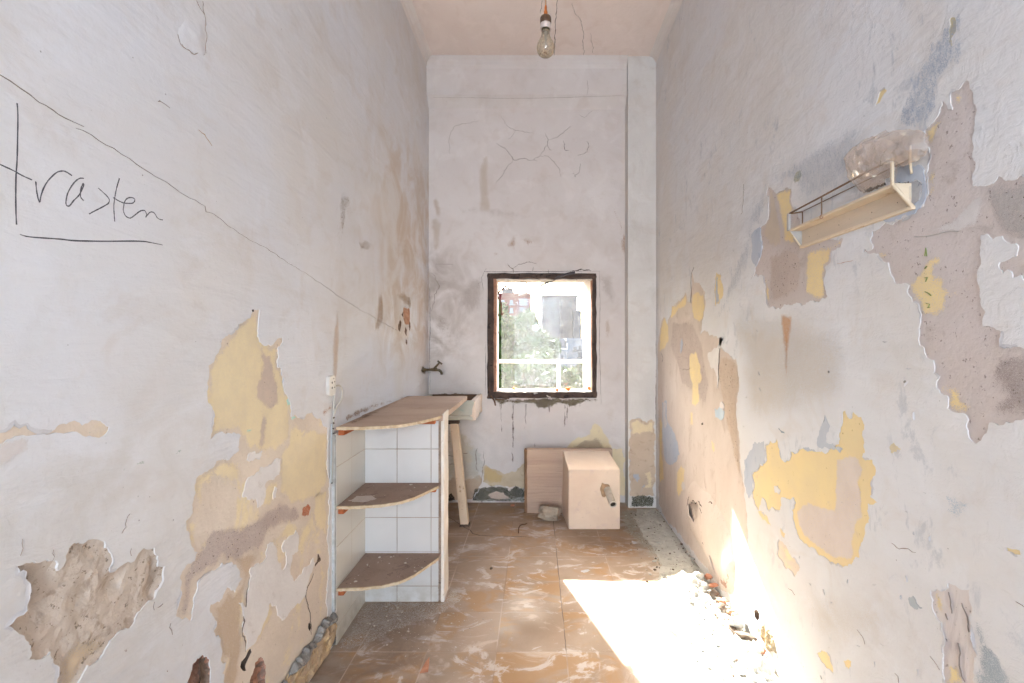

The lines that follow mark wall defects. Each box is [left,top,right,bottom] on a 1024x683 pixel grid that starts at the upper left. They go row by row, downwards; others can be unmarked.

crack [196,0,207,51]
crack [496,81,597,182]
peeling [751,170,843,309]
flaking render [864,14,1024,443]
flaking render [398,307,411,344]
peeling [0,420,108,466]
peeling [176,309,338,683]
peeling [448,450,524,502]
peeling [567,273,877,599]
flaking render [4,539,163,683]
peeling [900,584,1009,683]